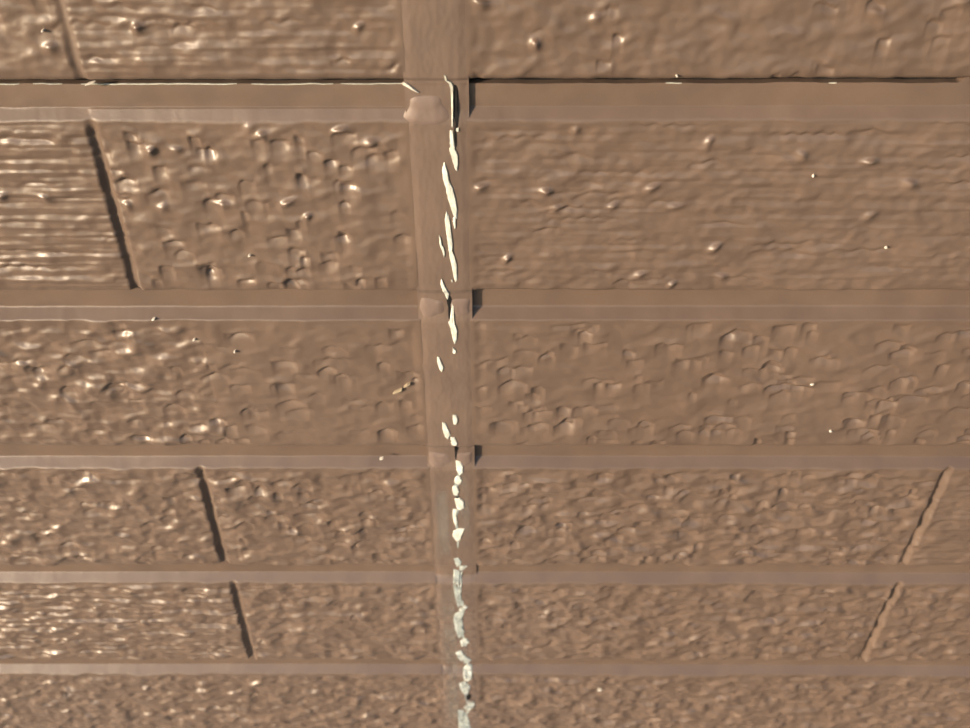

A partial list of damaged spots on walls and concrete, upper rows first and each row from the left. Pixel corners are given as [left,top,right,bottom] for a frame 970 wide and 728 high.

crack [0,77,402,85]
crack [437,75,957,372]
crack [442,415,475,728]